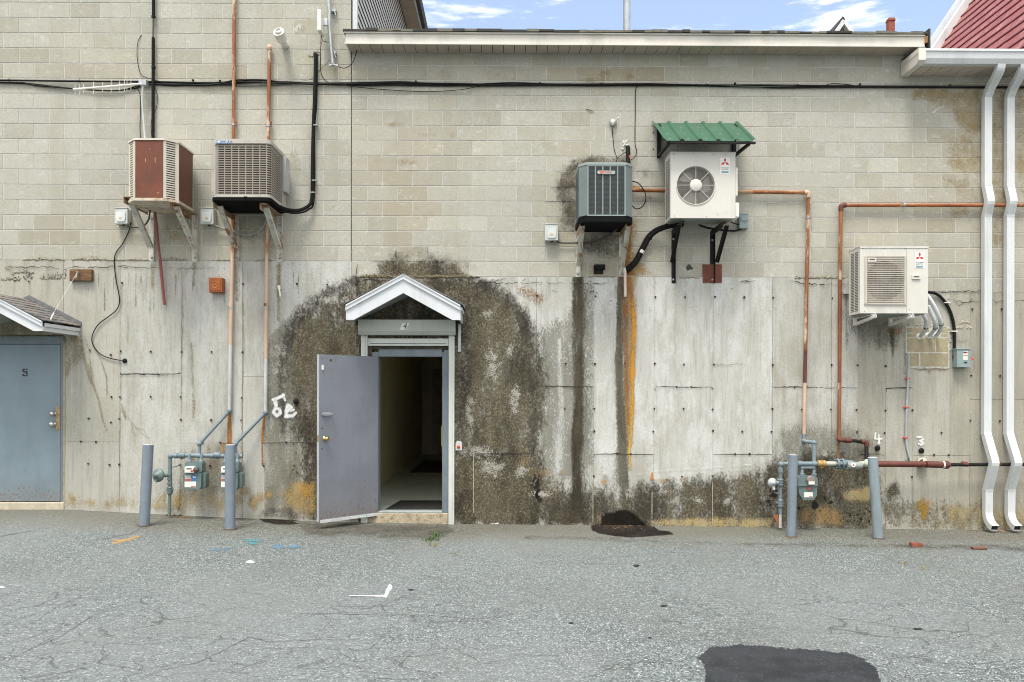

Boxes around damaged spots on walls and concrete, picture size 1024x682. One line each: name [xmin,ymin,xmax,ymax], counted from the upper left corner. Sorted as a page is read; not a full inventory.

leakage [153,256,1024,538]
rust [621,220,645,470]